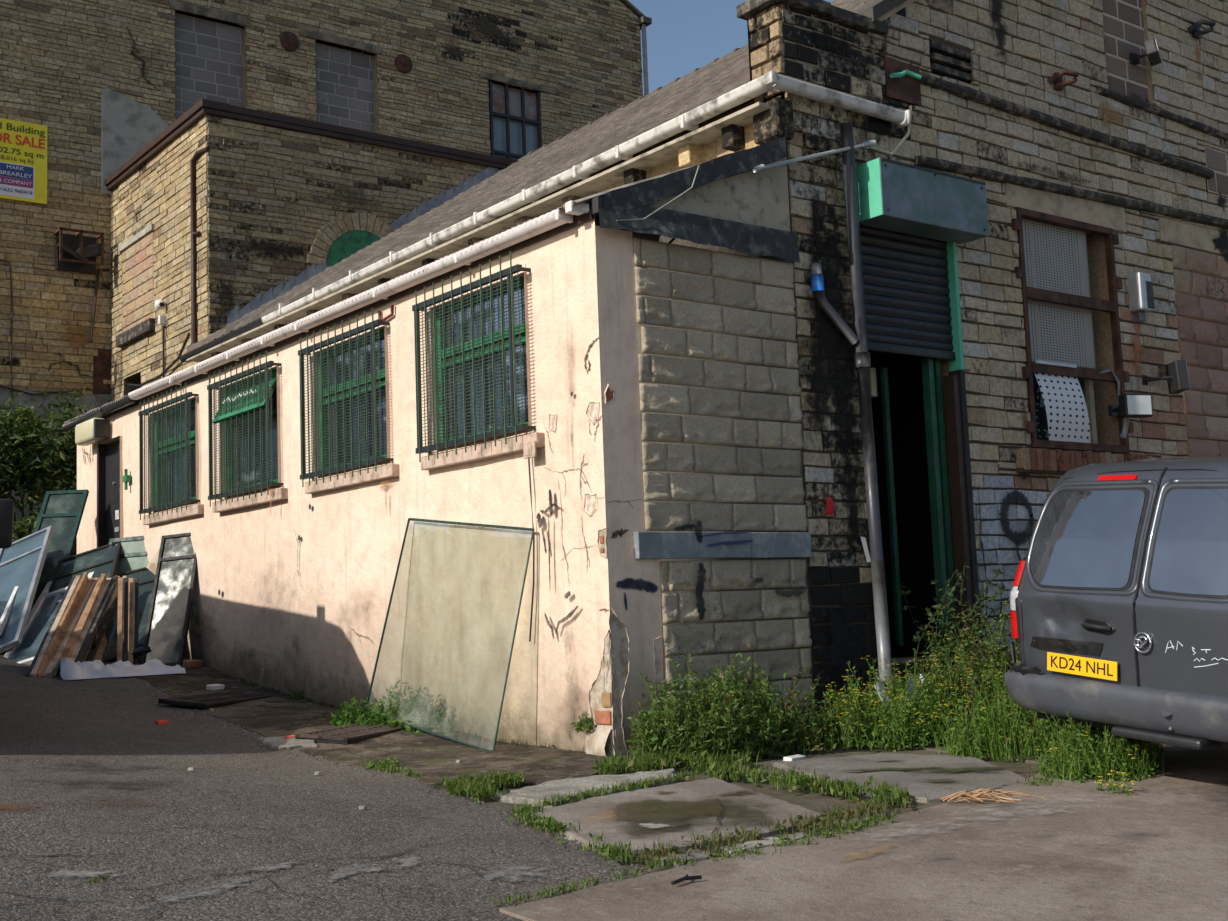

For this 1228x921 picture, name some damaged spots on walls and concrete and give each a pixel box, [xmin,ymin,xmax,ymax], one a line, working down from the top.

leakage [809,190,824,261]
crack [544,416,642,581]
leakage [844,461,860,546]
spalling [585,606,630,757]